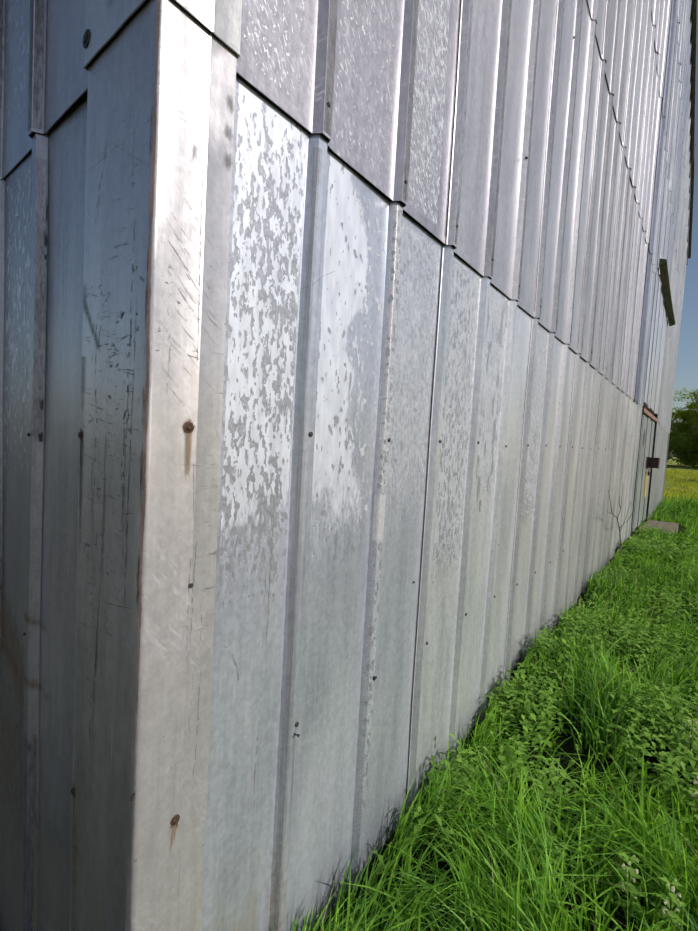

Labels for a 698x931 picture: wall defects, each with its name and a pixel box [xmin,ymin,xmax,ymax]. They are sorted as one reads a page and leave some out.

peeling [4,166,32,474]
corrosion [183,420,193,470]
peeling [216,79,308,609]